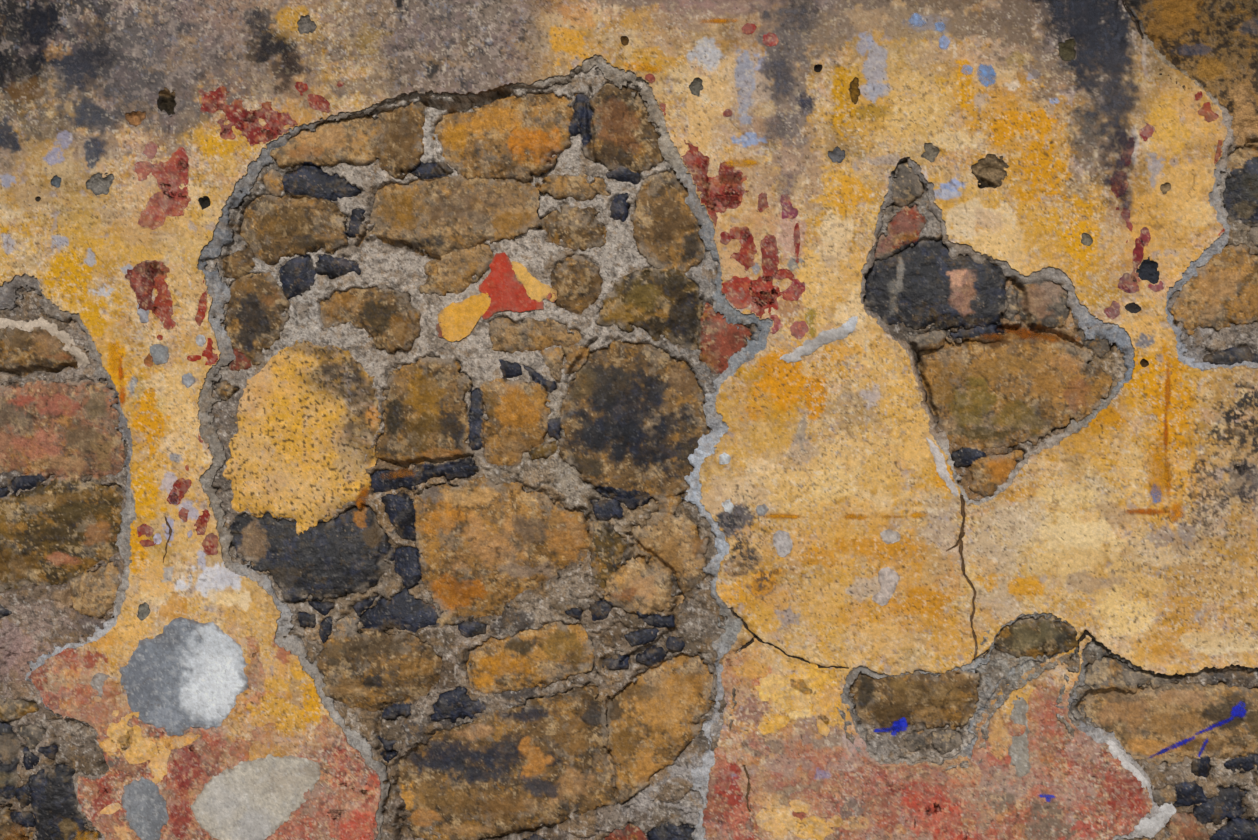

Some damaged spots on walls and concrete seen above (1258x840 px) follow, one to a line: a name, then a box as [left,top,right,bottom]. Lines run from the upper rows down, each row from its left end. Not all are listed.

water stain [76,103,106,156]
water stain [248,11,296,91]
flaking render [848,77,861,104]
water stain [1050,0,1137,209]
peeling [125,260,176,340]
flaking render [860,0,1258,505]
flaking render [167,55,845,840]
flaking render [0,273,283,840]
crack [730,607,849,669]
crack [946,494,990,661]
crack [1077,630,1094,645]
flaking render [837,611,1258,840]